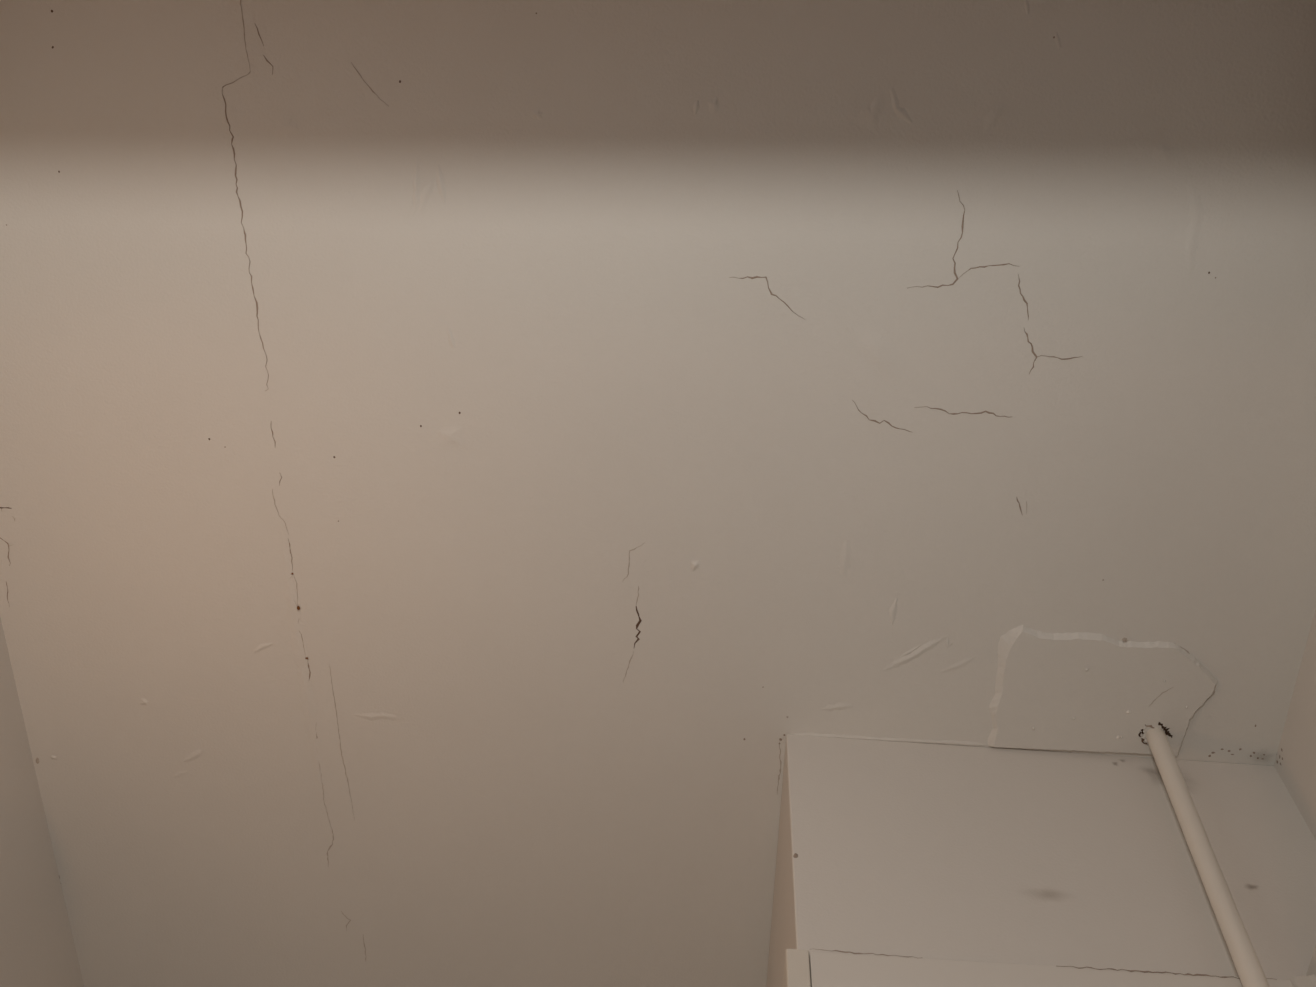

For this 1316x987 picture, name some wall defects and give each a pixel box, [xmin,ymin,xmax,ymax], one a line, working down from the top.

crack [222,0,273,390]
crack [734,276,804,319]
crack [909,190,1082,374]
crack [852,400,1009,432]
crack [271,429,311,679]
crack [622,543,644,681]
flaking render [1134,718,1174,747]